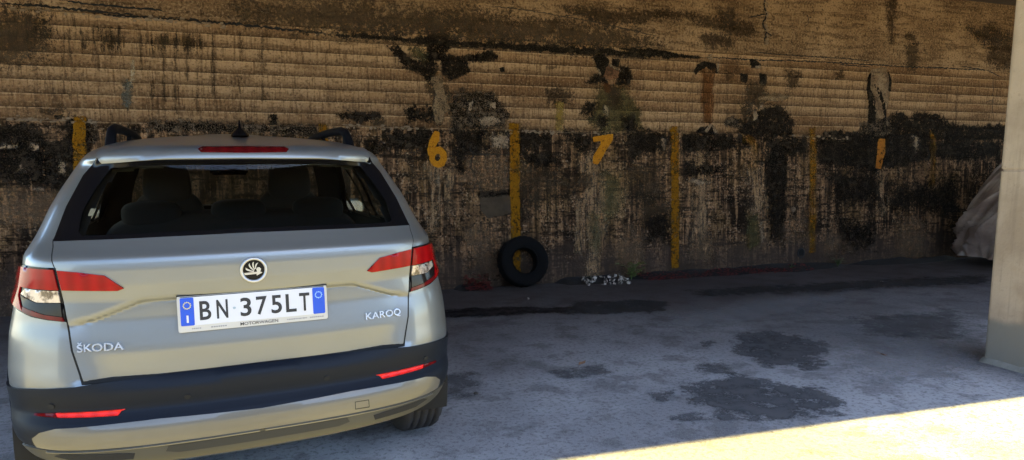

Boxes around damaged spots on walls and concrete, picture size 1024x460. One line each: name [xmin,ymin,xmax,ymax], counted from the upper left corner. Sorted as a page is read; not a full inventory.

leakage [0,119,98,192]
leakage [120,0,759,236]
crack [0,0,1001,121]
leakage [623,101,1005,266]